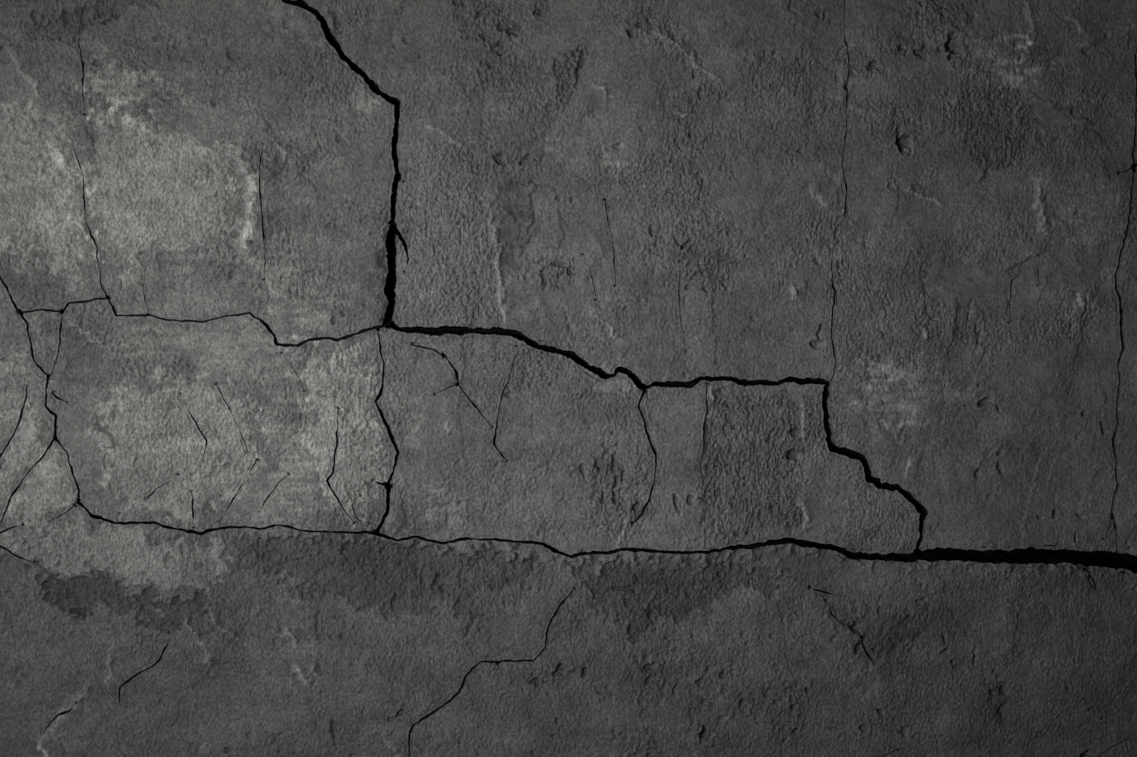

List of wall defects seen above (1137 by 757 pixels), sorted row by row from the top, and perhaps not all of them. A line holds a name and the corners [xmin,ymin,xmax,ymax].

crack [0,0,1137,591]
crack [408,588,574,757]